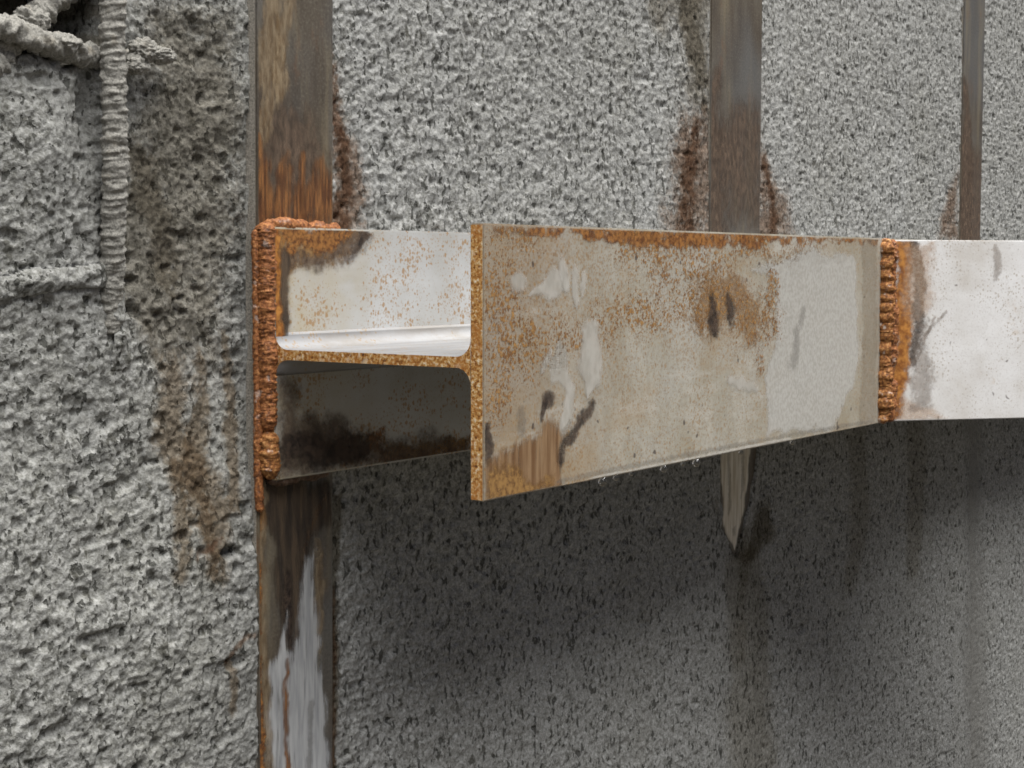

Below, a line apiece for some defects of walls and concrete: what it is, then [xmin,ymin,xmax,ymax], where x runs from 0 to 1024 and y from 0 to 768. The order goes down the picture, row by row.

spalling [13,5,83,51]
spalling [125,36,177,75]
rust [258,102,371,337]
rust [485,70,878,434]
rust [277,379,471,477]
rust [486,421,562,499]